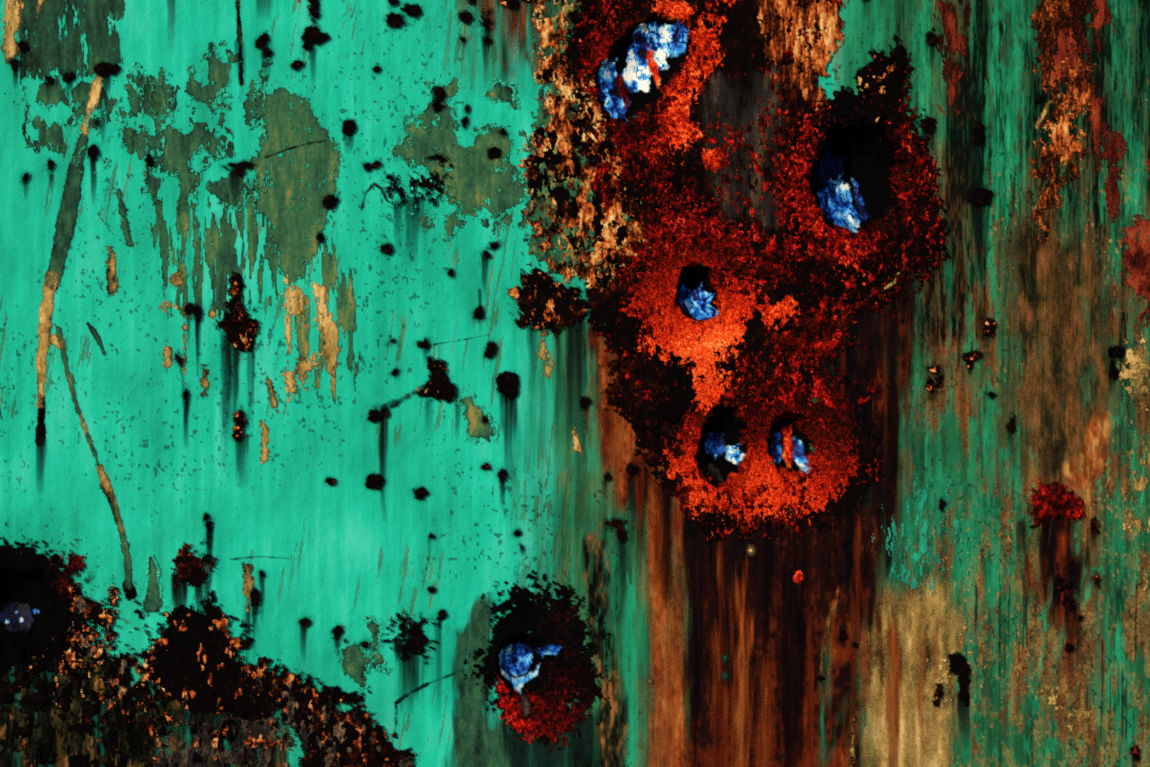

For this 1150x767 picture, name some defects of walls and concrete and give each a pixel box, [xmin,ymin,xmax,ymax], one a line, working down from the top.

rust [87,144,99,187]
rust [93,62,121,97]
peeling [0,0,364,413]
peeling [390,0,595,281]
rust [183,302,203,355]
rust [215,270,261,463]
peeling [259,420,270,464]
rust [416,337,458,410]
rust [452,0,972,767]
rust [961,0,1126,653]
rust [0,512,416,767]
rust [331,609,447,693]